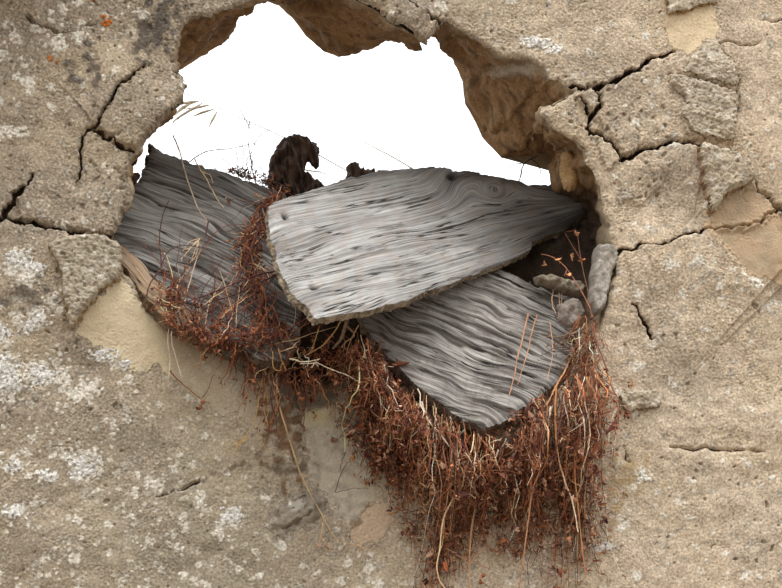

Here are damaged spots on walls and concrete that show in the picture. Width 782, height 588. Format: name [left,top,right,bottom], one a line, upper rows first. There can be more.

crack [76,65,150,183]
crack [568,51,700,163]
crack [0,173,84,235]
crack [617,229,704,256]
crack [631,303,653,340]
crack [681,445,745,453]